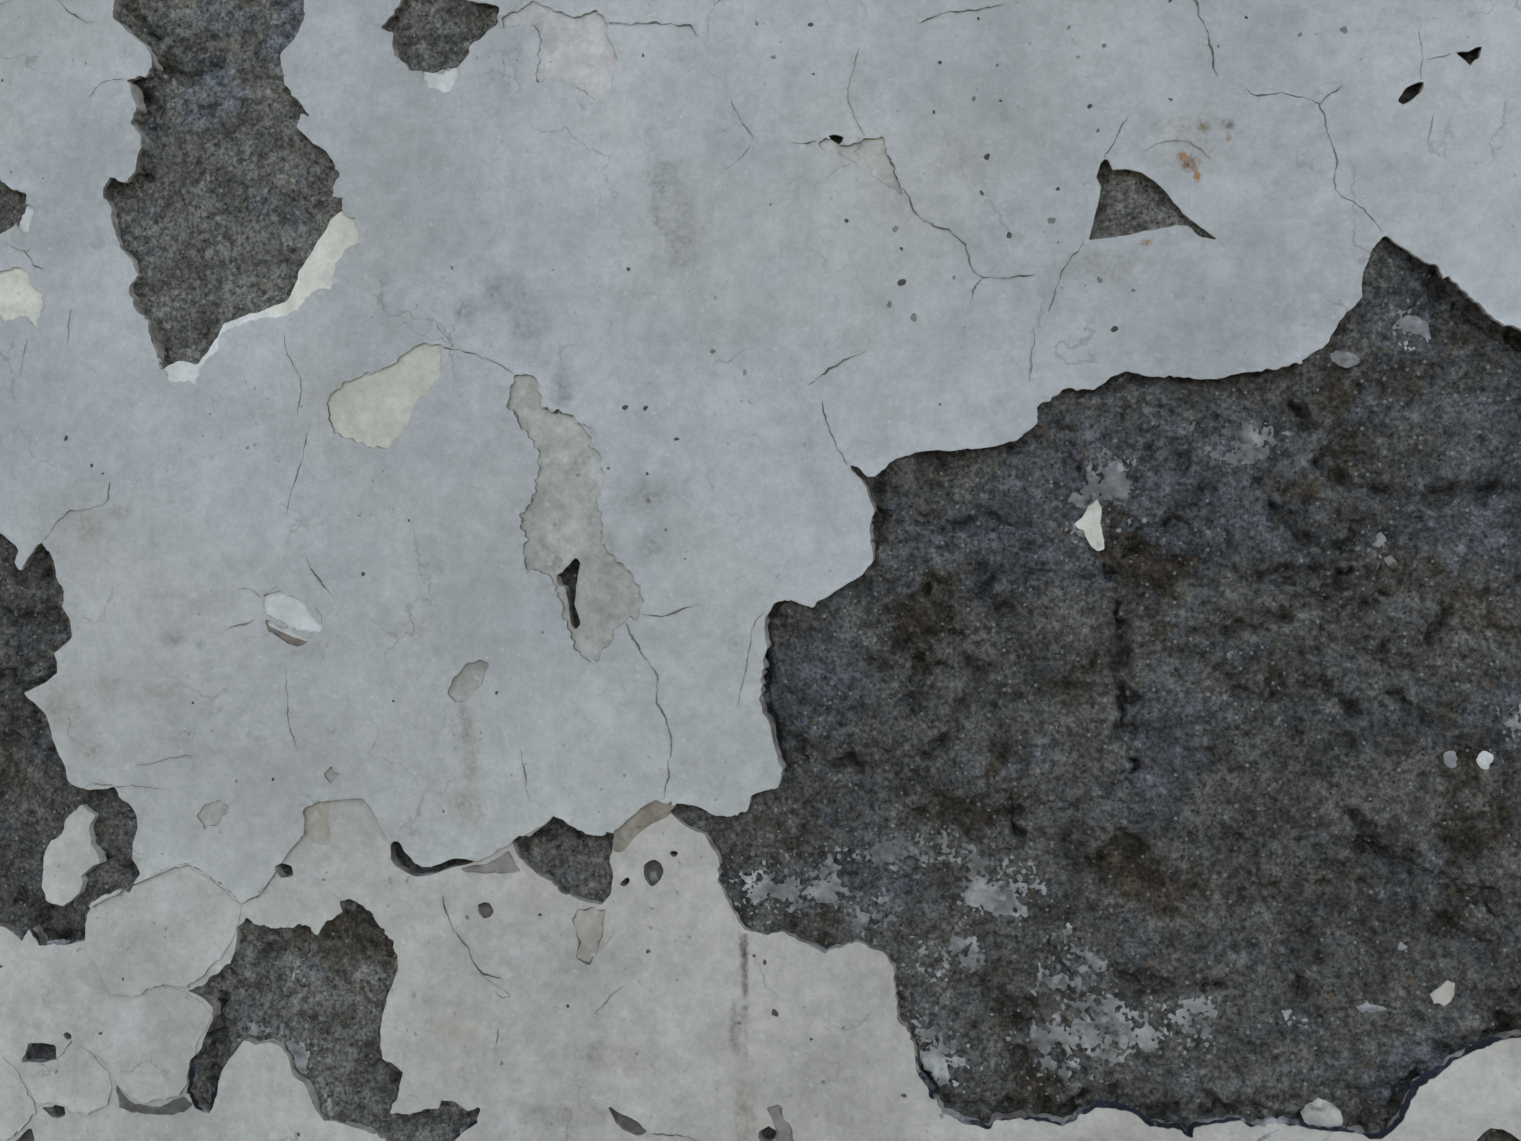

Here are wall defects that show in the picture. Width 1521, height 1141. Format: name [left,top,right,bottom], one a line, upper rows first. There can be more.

spalling [103,0,359,386]
peeling [381,0,617,100]
crack [605,0,720,37]
crack [921,3,1004,23]
crack [847,48,1084,383]
spalling [1089,160,1215,240]
crack [1104,115,1211,159]
crack [1194,0,1381,230]
crack [1418,25,1451,80]
spalling [0,533,140,946]
spalling [391,237,1521,1141]
spalling [116,899,480,1141]